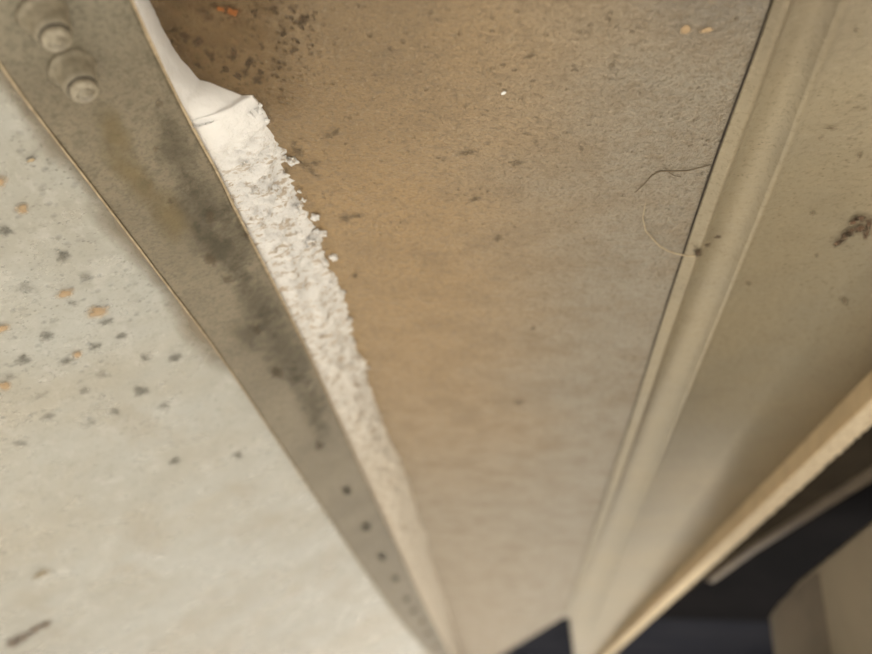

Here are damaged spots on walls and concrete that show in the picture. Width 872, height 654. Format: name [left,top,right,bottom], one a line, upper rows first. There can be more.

spalling [134,0,460,654]